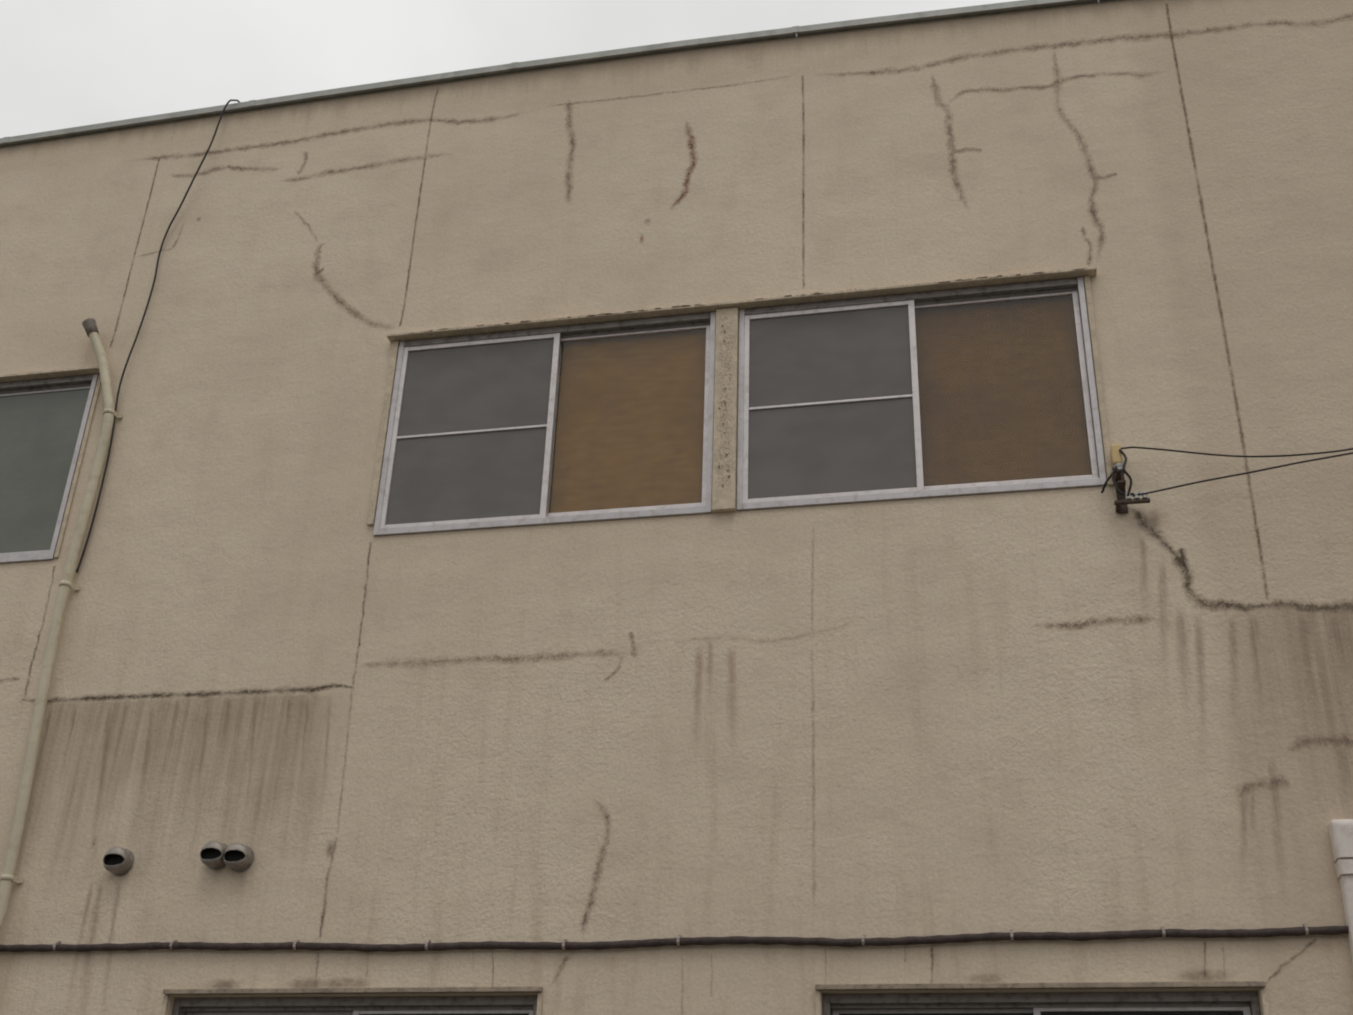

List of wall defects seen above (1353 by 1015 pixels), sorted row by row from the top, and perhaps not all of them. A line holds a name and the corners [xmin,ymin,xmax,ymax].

crack [154,130,373,180]
crack [675,136,695,204]
crack [1083,167,1116,264]
crack [1136,511,1353,611]
crack [1049,618,1142,628]
crack [15,678,350,702]